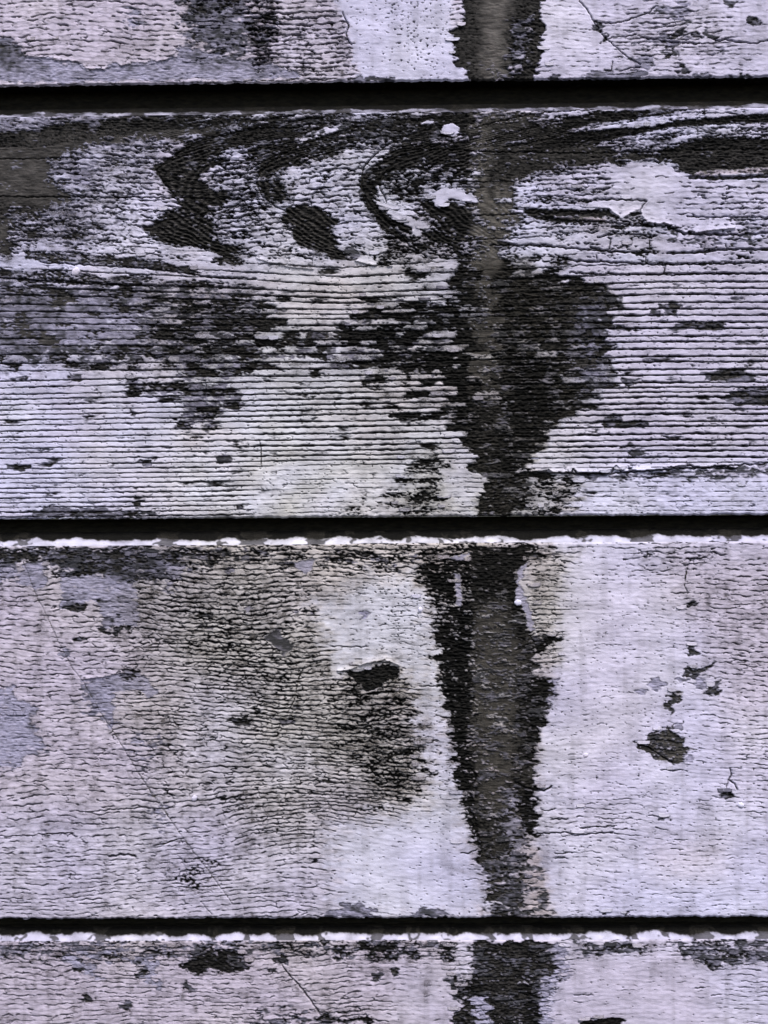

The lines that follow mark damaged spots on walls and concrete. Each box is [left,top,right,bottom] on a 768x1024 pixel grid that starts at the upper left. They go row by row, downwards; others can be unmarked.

peeling [335,662,408,693]
peeling [633,642,722,770]